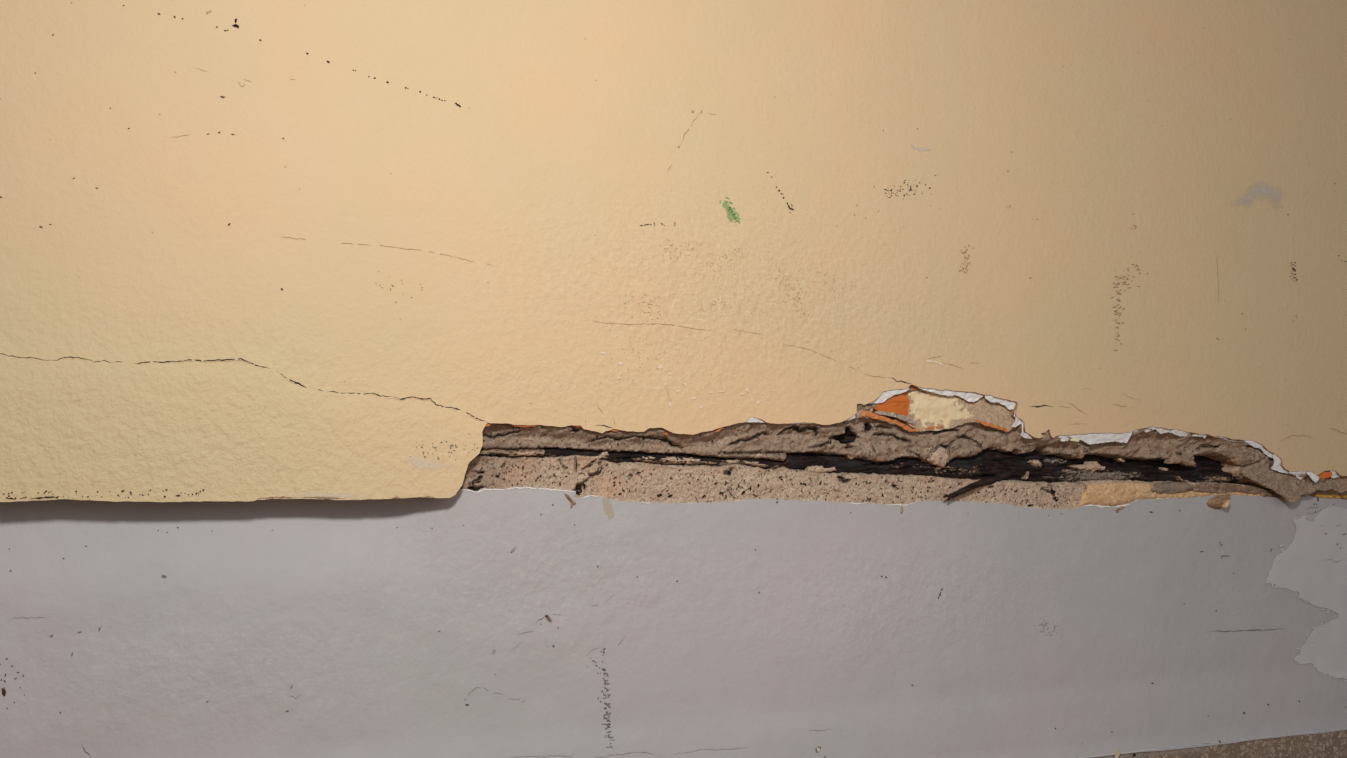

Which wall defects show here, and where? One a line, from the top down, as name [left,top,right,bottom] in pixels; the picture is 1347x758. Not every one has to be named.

crack [0,353,484,421]
spalling [410,360,1347,514]